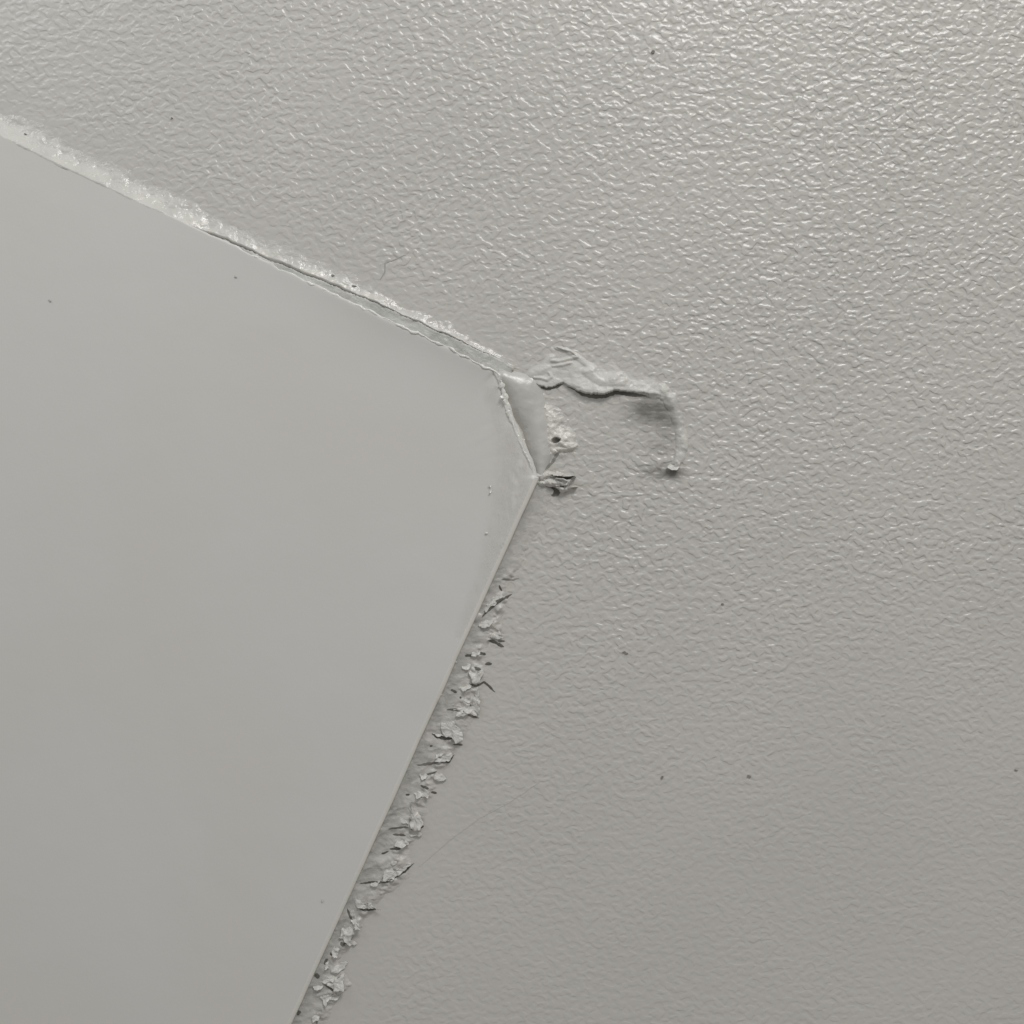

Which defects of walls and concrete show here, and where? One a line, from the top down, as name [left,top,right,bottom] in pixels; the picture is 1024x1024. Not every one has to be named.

peeling [525,346,689,470]
peeling [542,471,569,496]
peeling [360,627,505,887]
peeling [297,899,380,1024]